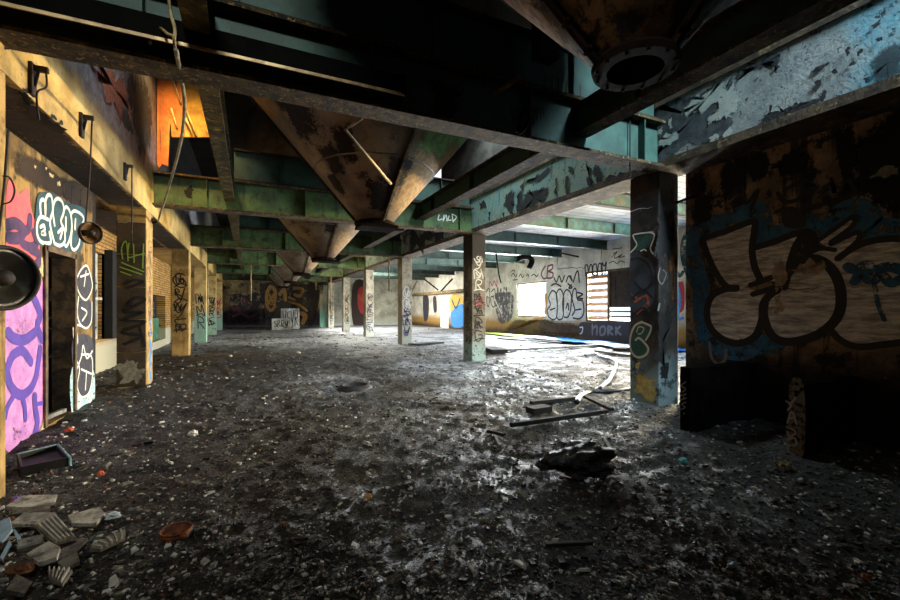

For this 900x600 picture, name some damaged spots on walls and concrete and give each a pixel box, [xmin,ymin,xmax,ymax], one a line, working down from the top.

peeling [654,53,781,161]
peeling [810,62,838,102]
rust [275,101,360,195]
rust [363,153,414,214]
peeling [502,166,574,217]
peeling [586,163,626,186]